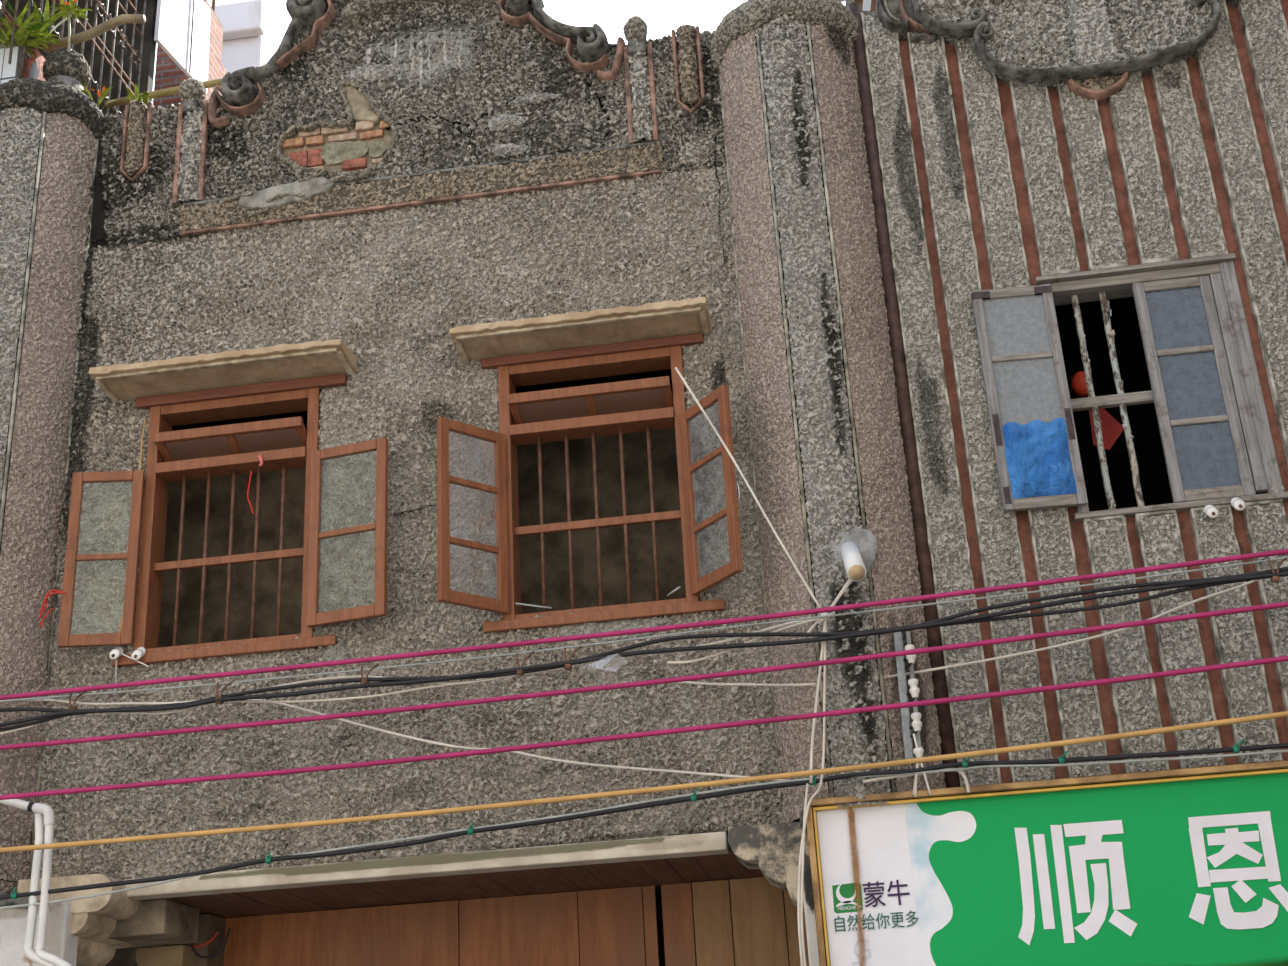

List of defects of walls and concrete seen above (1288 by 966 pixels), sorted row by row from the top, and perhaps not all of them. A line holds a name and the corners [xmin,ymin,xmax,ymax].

spalling [222,78,399,225]